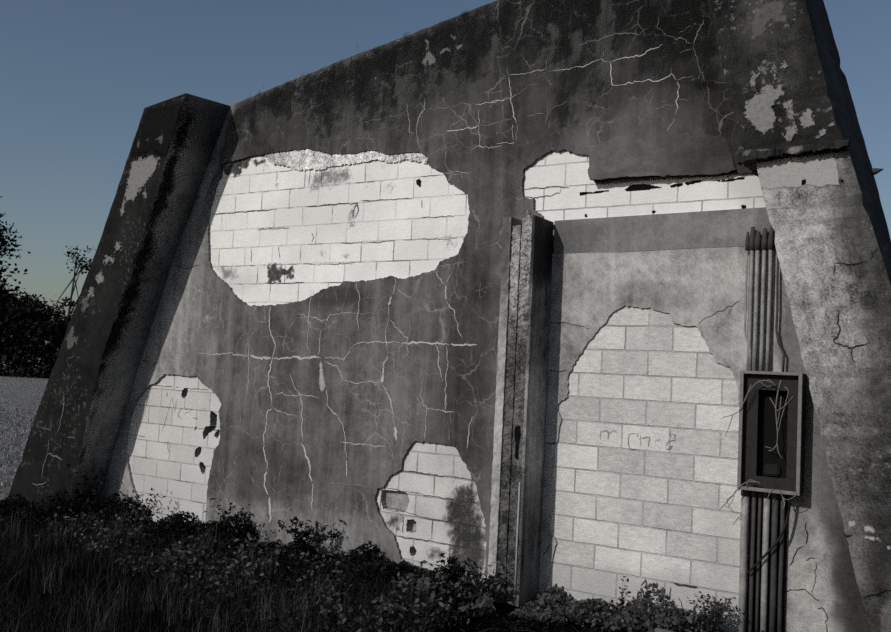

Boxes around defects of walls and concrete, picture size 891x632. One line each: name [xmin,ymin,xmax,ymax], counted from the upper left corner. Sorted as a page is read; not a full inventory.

damp [422,36,462,65]
crack [357,19,703,155]
peeling [743,1,787,40]
peeling [744,62,835,141]
spalling [209,149,470,306]
spalling [523,150,766,225]
spalling [127,374,221,525]
crack [200,273,477,523]
spalling [376,441,487,582]
spalling [544,306,741,619]
crack [786,521,827,631]
crack [833,313,870,361]